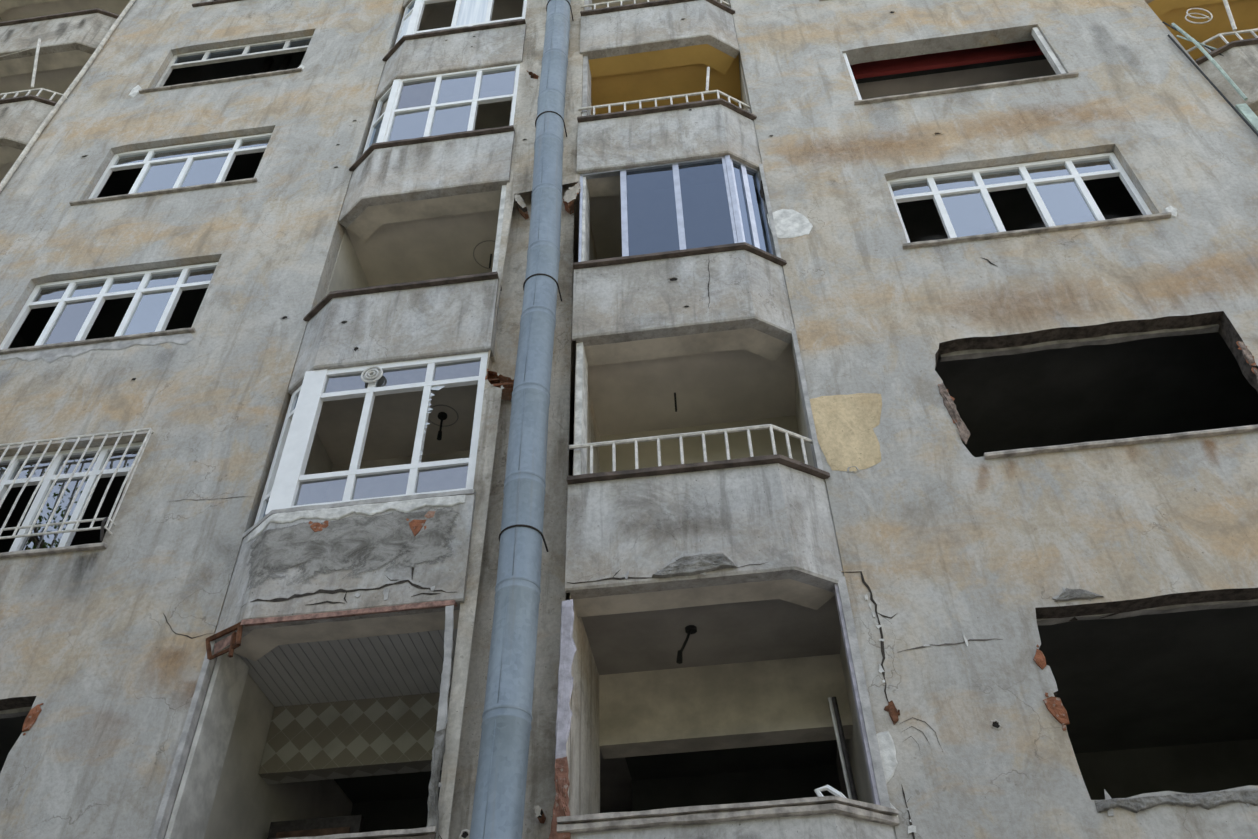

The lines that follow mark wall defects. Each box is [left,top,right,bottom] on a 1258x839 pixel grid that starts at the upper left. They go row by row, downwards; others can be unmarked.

spalling [485,368,514,394]
flaking render [246,495,465,588]
peeling [555,599,577,760]
crack [841,570,1003,757]